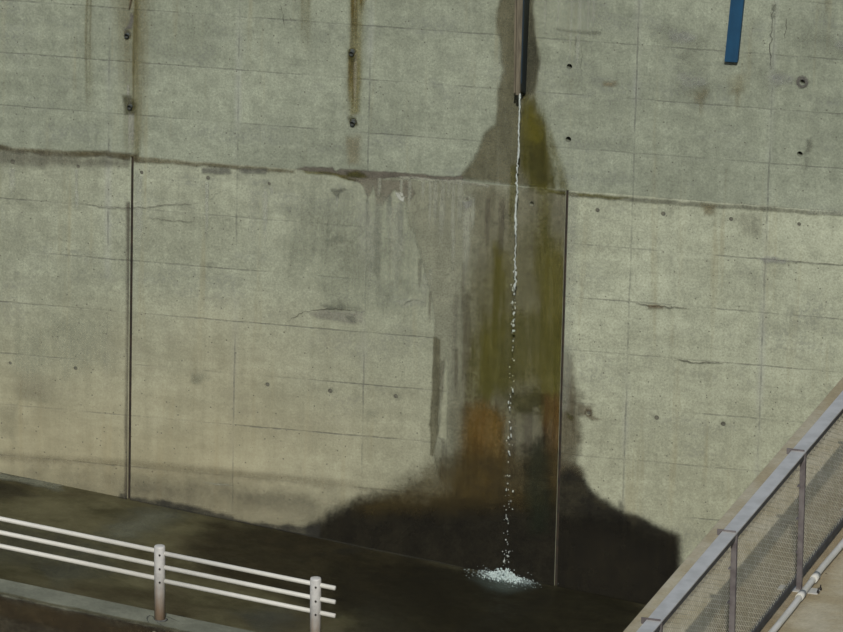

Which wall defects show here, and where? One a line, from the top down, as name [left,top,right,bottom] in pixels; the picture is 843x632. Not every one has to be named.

rust [349,38,360,124]
leakage [110,0,678,632]